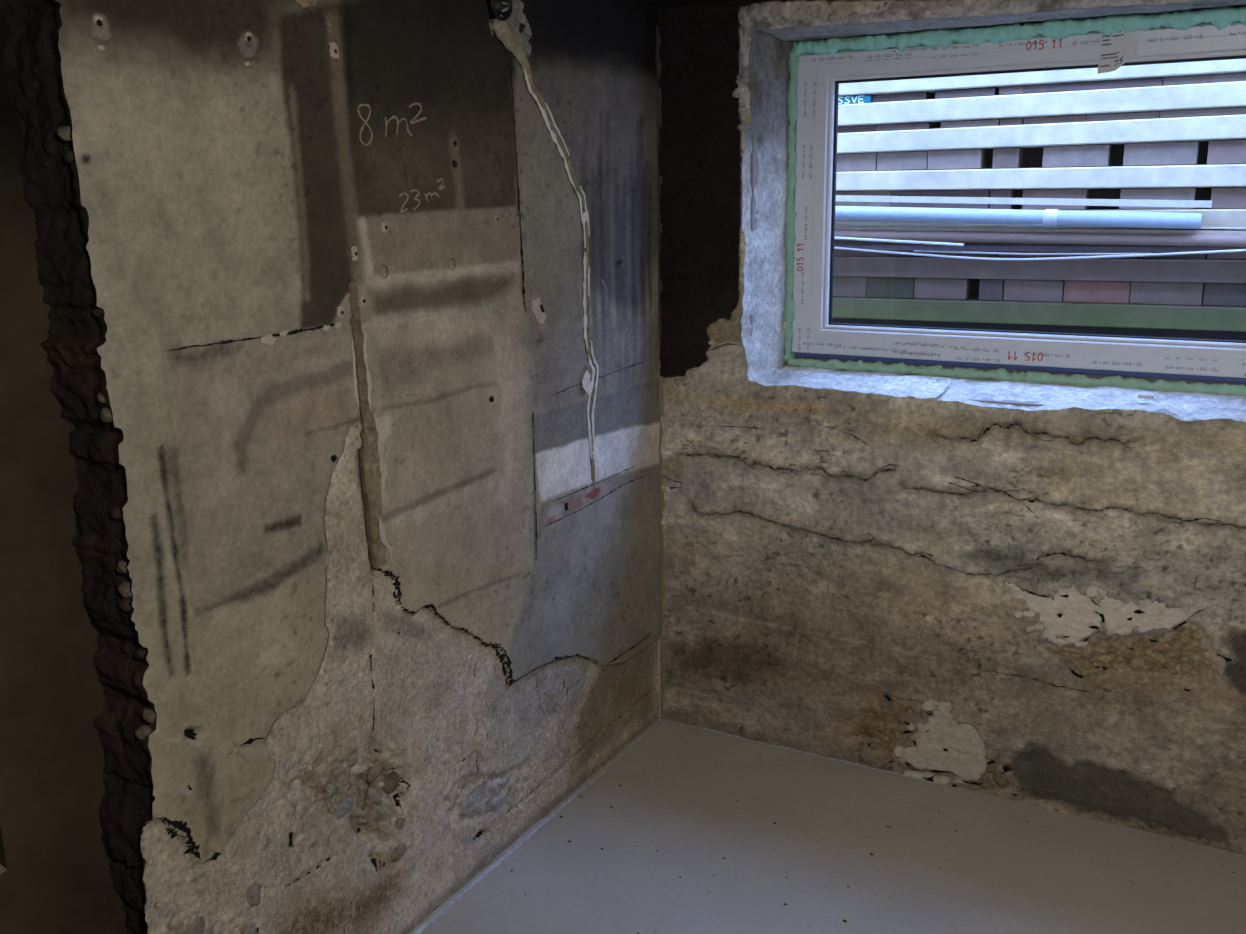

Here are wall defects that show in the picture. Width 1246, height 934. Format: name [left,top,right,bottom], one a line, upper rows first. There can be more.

crack [554,361,704,395]
spalling [707,297,742,351]
crack [533,417,1243,594]
spalling [140,333,660,934]
spalling [992,581,1232,691]
peeling [848,694,1019,797]